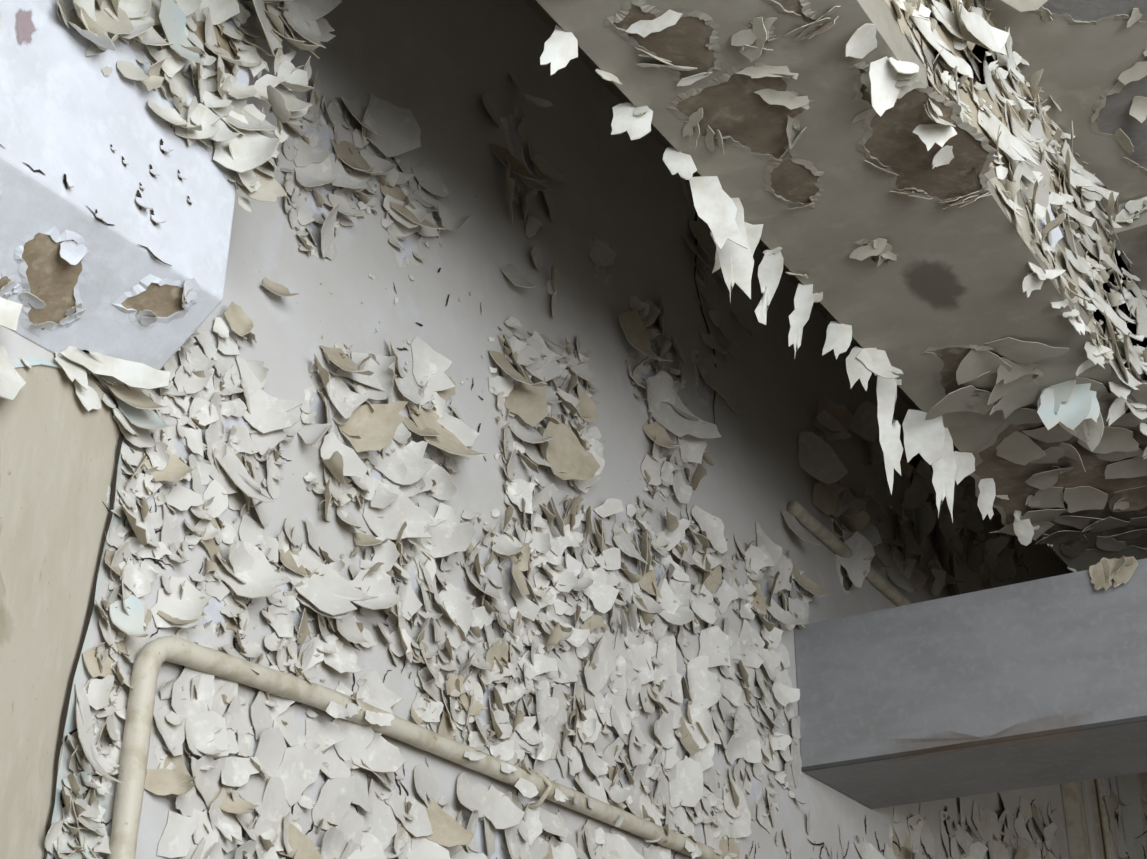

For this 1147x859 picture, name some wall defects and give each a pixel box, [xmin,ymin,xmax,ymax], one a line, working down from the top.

peeling [540,25,578,75]
peeling [595,68,622,85]
peeling [56,0,472,281]
peeling [603,0,841,357]
flaking render [111,274,201,329]
peeling [261,277,300,297]
flaking render [0,295,828,859]
peeling [811,792,1060,859]